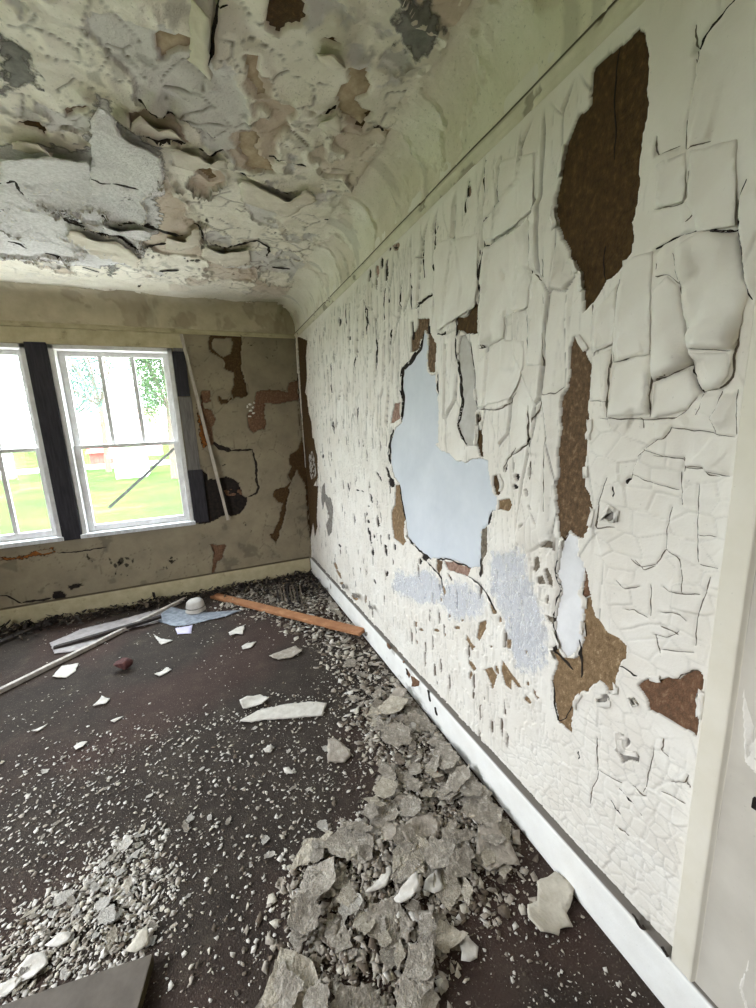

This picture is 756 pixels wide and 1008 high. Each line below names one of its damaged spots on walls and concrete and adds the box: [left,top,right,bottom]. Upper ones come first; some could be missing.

peeling [266,0,306,31]
crack [695,0,735,62]
peeling [0,95,251,276]
crack [464,159,544,304]
crack [655,117,711,176]
crack [655,179,753,300]
peeling [199,335,333,546]
peeling [348,152,545,602]
peeling [534,30,705,735]
peeling [416,605,539,703]
crack [552,556,583,721]
crack [577,738,691,836]